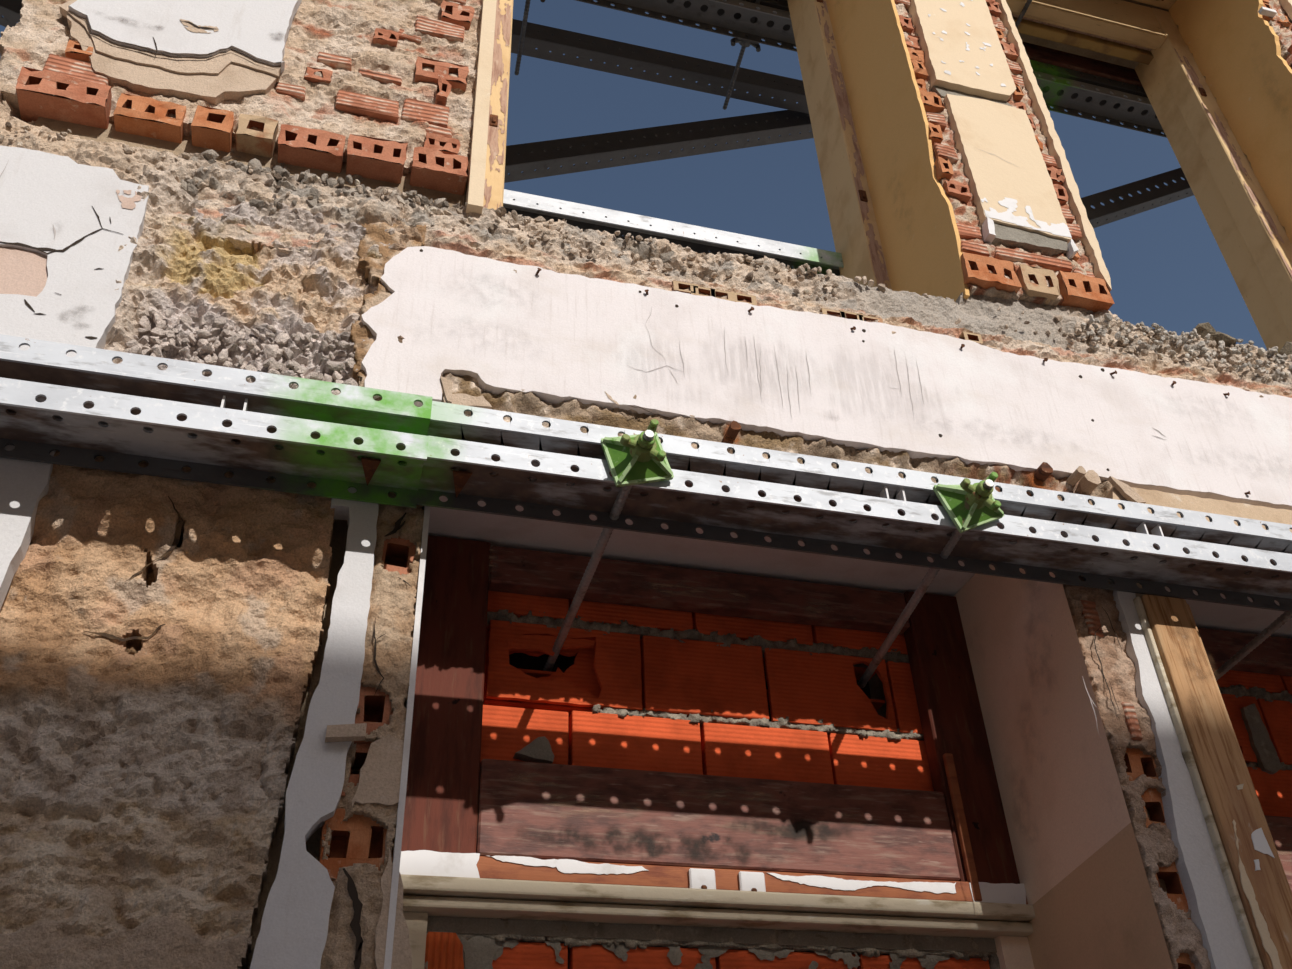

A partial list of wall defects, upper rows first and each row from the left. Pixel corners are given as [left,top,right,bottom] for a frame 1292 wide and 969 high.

spalling [179,19,219,33]
spalling [0,246,48,297]
crack [0,206,122,270]
spalling [350,221,426,399]
crack [125,496,183,582]
spalling [382,536,416,575]
crack [84,624,166,641]
spalling [483,625,603,709]
spalling [318,685,649,881]
spalling [1124,747,1167,828]
spalling [1155,862,1191,919]
peeling [1232,820,1283,969]